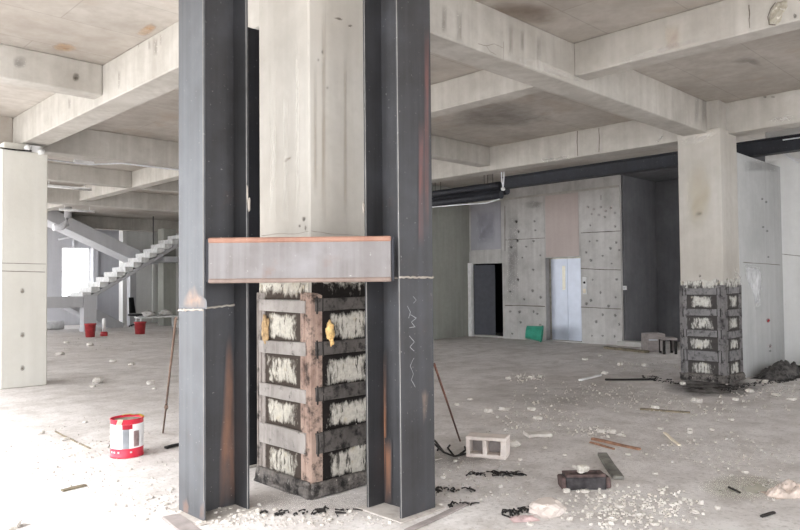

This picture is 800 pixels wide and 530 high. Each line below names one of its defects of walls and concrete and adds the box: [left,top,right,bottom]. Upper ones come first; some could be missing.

rust [418,23,429,250]
rust [218,330,235,508]
rust [383,348,392,505]